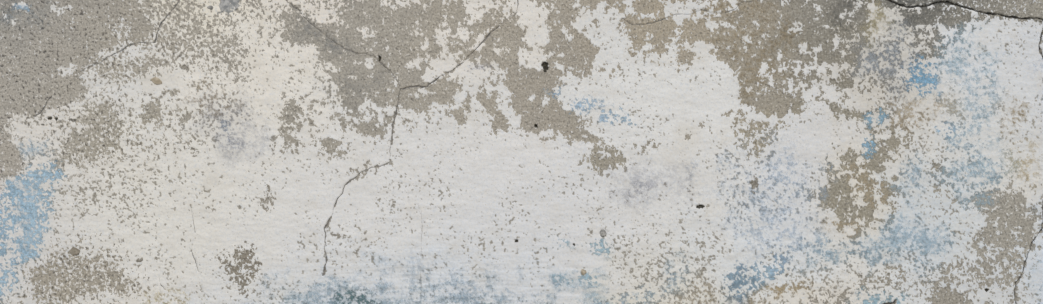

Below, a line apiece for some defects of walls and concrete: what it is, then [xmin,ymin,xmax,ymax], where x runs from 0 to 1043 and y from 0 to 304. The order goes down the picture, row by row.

crack [74,1,179,74]
peeling [0,0,285,193]
crack [286,0,518,276]
peeling [258,0,1043,245]
crack [887,0,1043,58]
peeling [0,229,161,304]
peeling [640,155,1043,304]
crack [1014,205,1043,303]